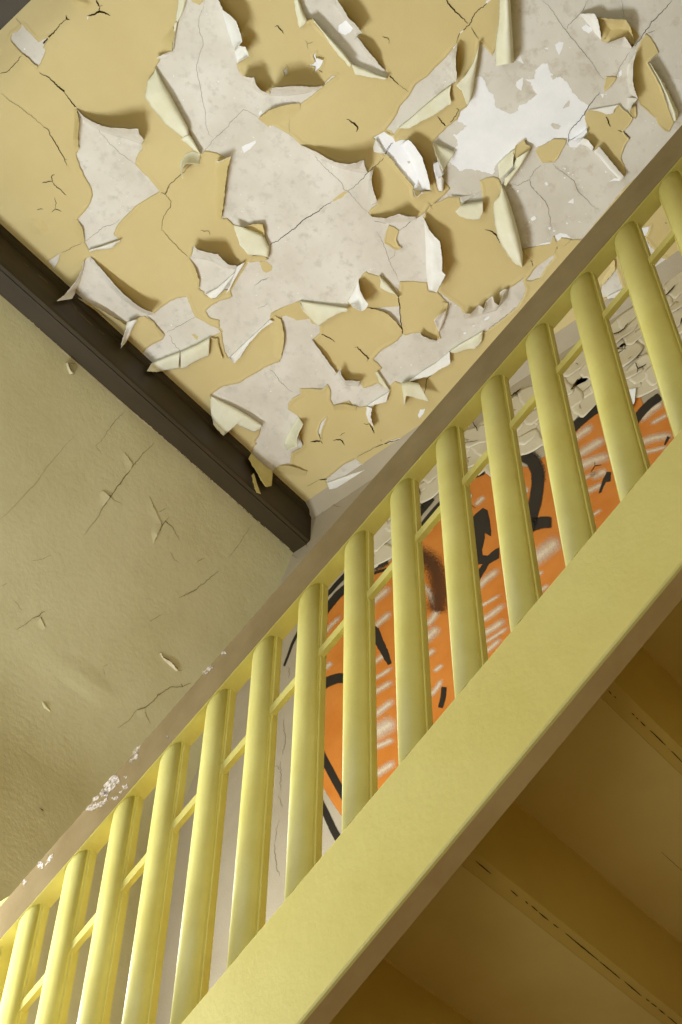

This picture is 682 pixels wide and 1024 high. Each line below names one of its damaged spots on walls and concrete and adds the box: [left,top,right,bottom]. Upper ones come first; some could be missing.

peeling [7,21,53,71]
crack [12,102,67,212]
peeling [43,250,64,273]
peeling [57,0,682,494]
spalling [0,296,289,549]
crack [18,415,215,598]
peeling [374,517,392,568]
peeling [419,464,439,508]
crack [511,890,677,1024]